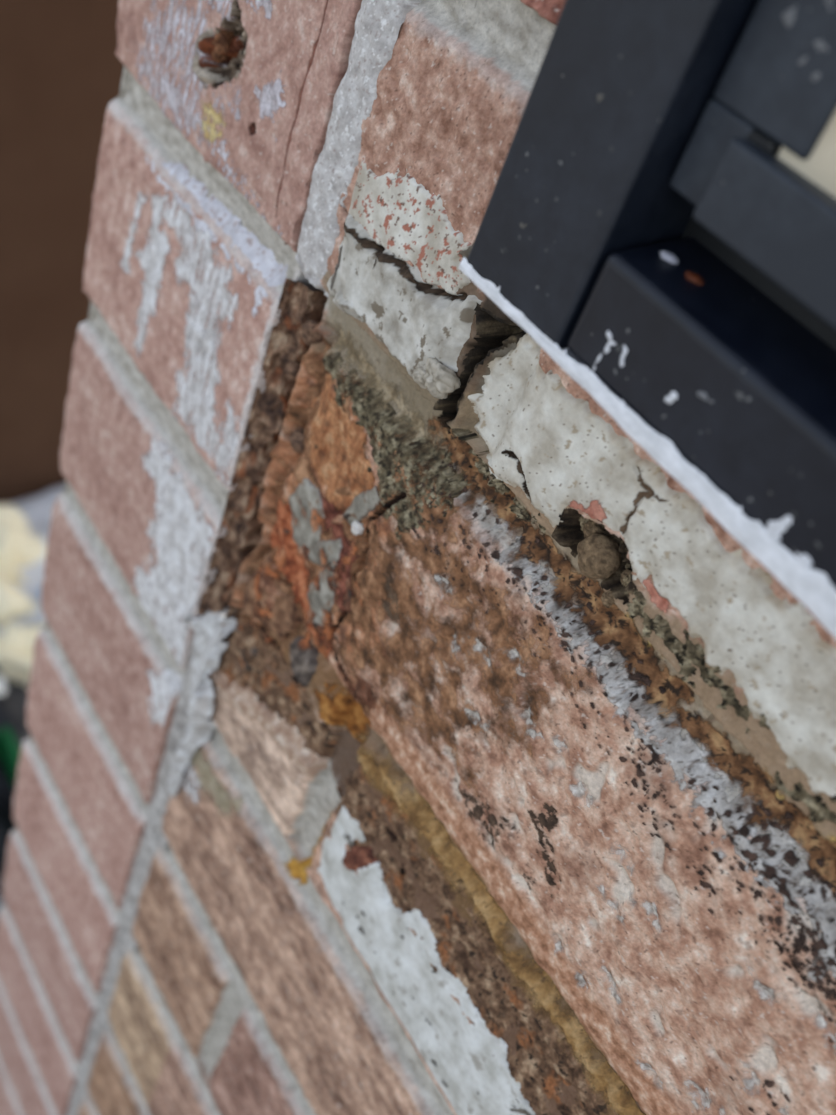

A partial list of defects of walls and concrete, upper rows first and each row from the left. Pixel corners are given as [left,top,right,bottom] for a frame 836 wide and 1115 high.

spalling [192,0,248,89]
crack [344,210,468,301]
rust [197,279,378,743]
peeling [327,157,836,823]
spalling [212,605,347,777]
rust [427,417,836,897]
rust [283,808,336,885]
rust [342,845,378,871]
spalling [629,894,661,930]
spalling [816,1013,836,1049]